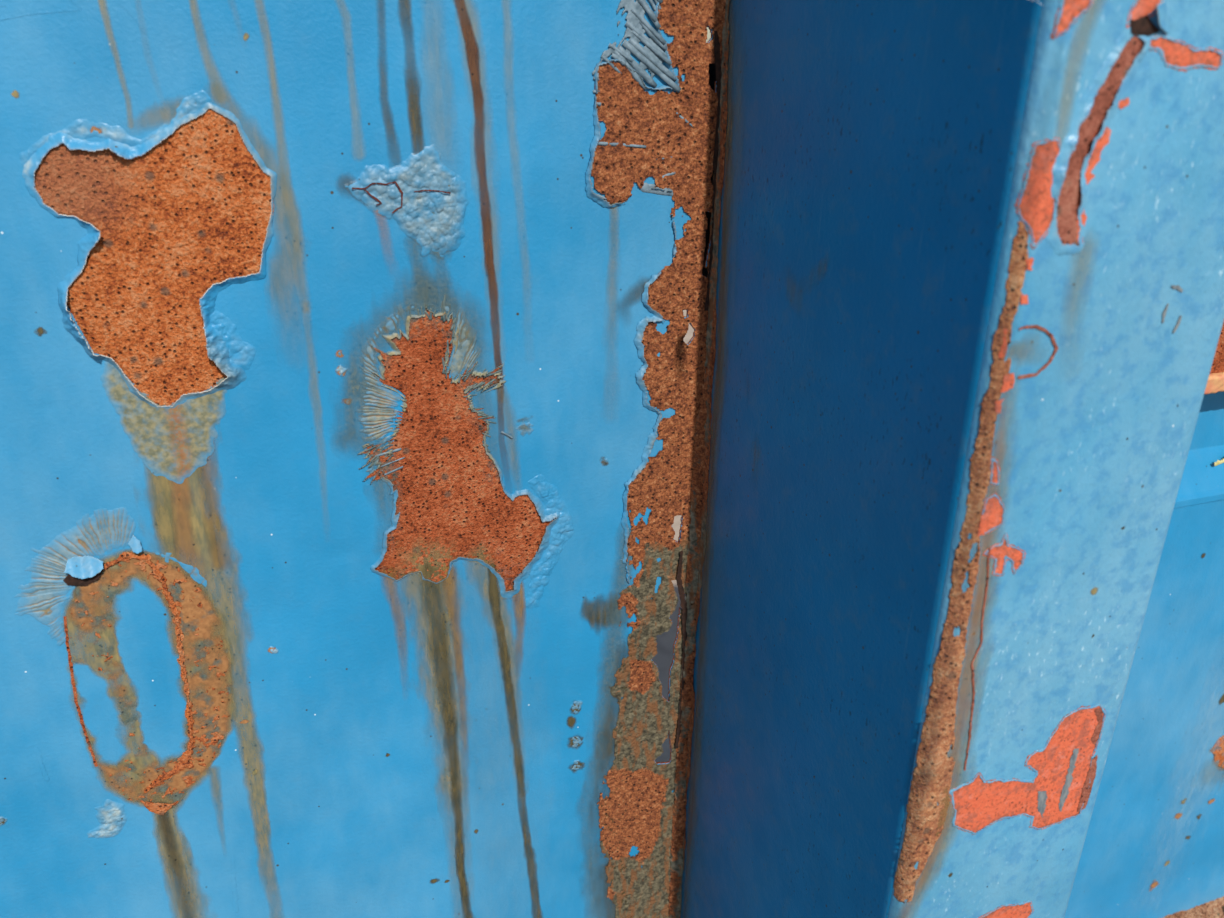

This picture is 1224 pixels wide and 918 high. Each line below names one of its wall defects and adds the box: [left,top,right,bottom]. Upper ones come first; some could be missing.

peeling [1050,0,1093,39]
peeling [1126,0,1223,72]
peeling [1015,138,1061,250]
rust [1045,25,1151,256]
rust [14,90,286,918]
rust [583,0,732,918]
rust [893,222,1034,903]
peeling [949,704,1106,835]
rust [1210,735,1224,769]
peeling [979,901,1034,918]